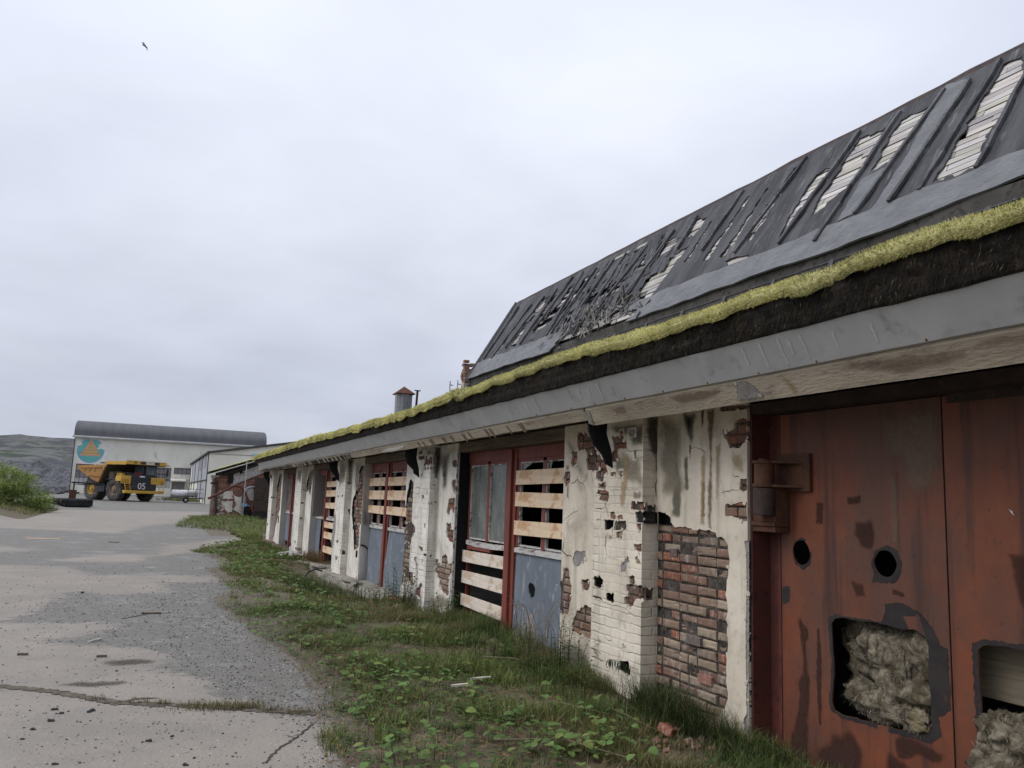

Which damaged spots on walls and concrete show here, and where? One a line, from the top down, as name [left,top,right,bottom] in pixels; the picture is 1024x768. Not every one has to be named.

spalling [331,467,365,560]
spalling [401,459,460,598]
spalling [556,410,730,722]
leakage [615,390,718,523]
spalling [721,381,763,448]
crack [0,684,327,763]